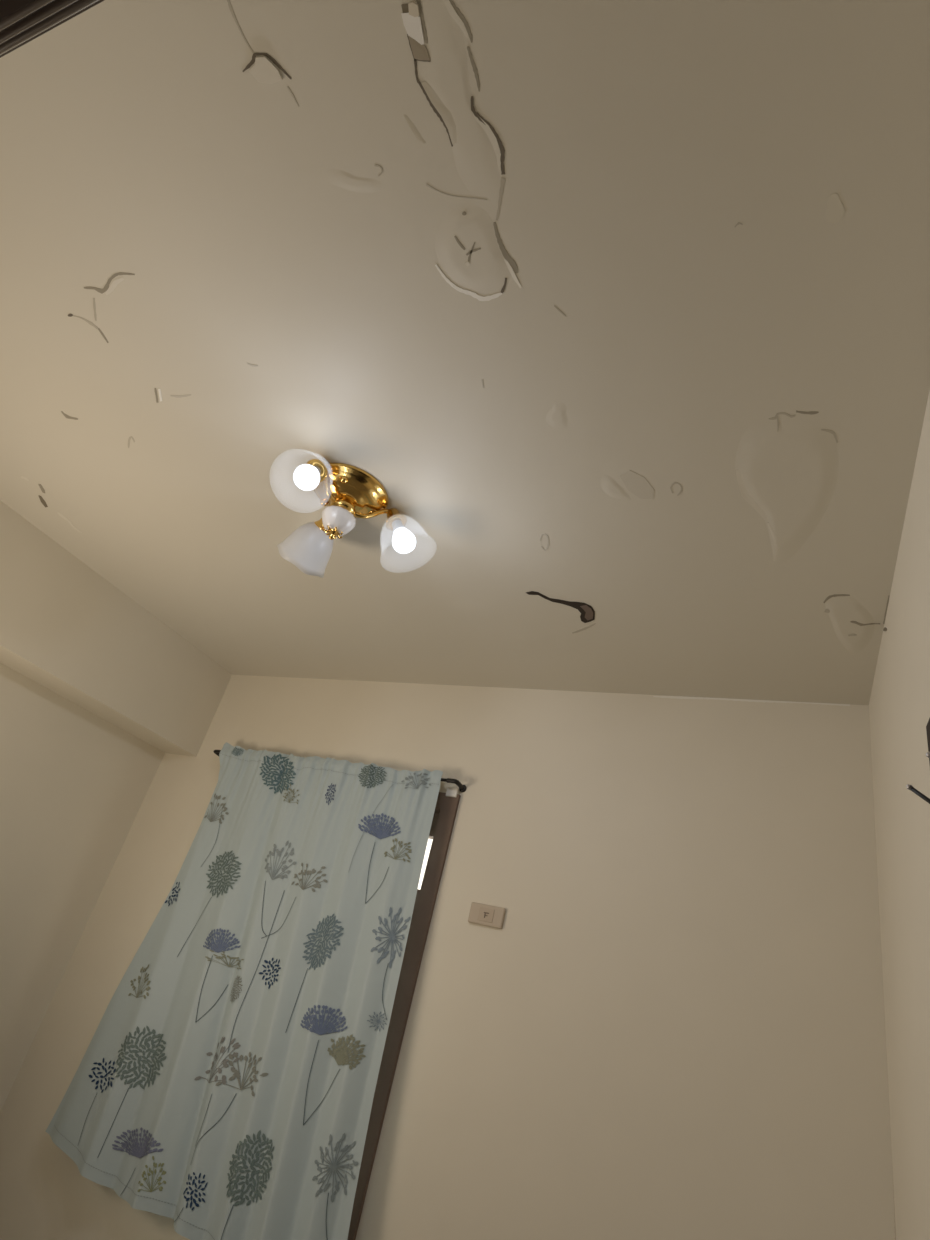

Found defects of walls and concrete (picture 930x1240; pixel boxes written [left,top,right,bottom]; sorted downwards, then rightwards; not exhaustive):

flaking render [401,1,430,61]
peeling [249,56,283,84]
peeling [470,102,501,171]
peeling [527,586,567,599]